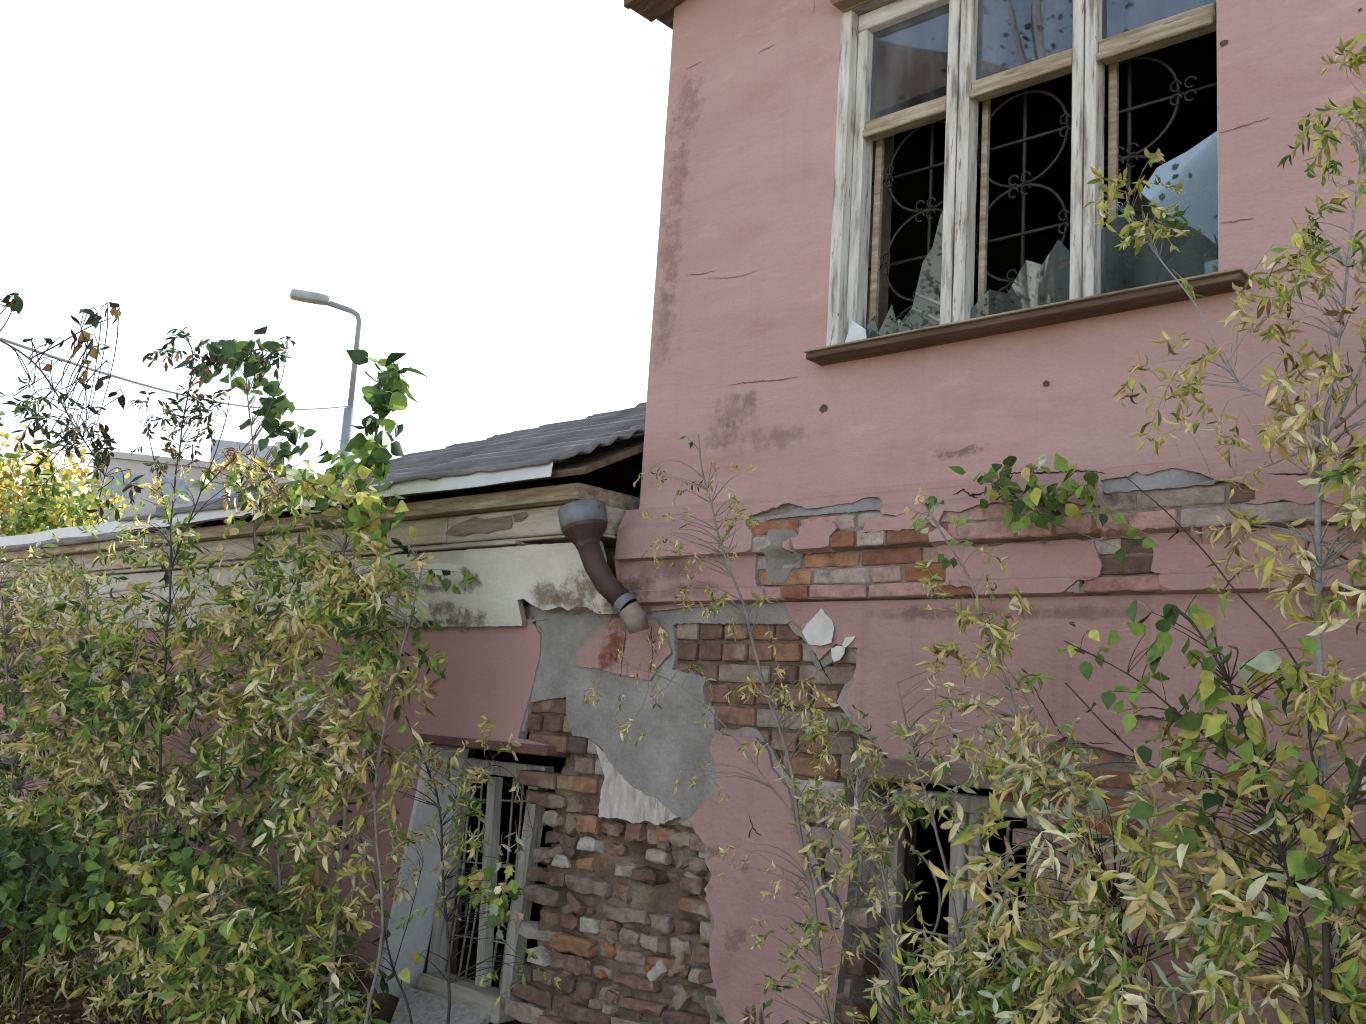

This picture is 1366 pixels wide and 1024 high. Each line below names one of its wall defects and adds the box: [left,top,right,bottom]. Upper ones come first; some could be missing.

flaking render [504,469,1366,1024]